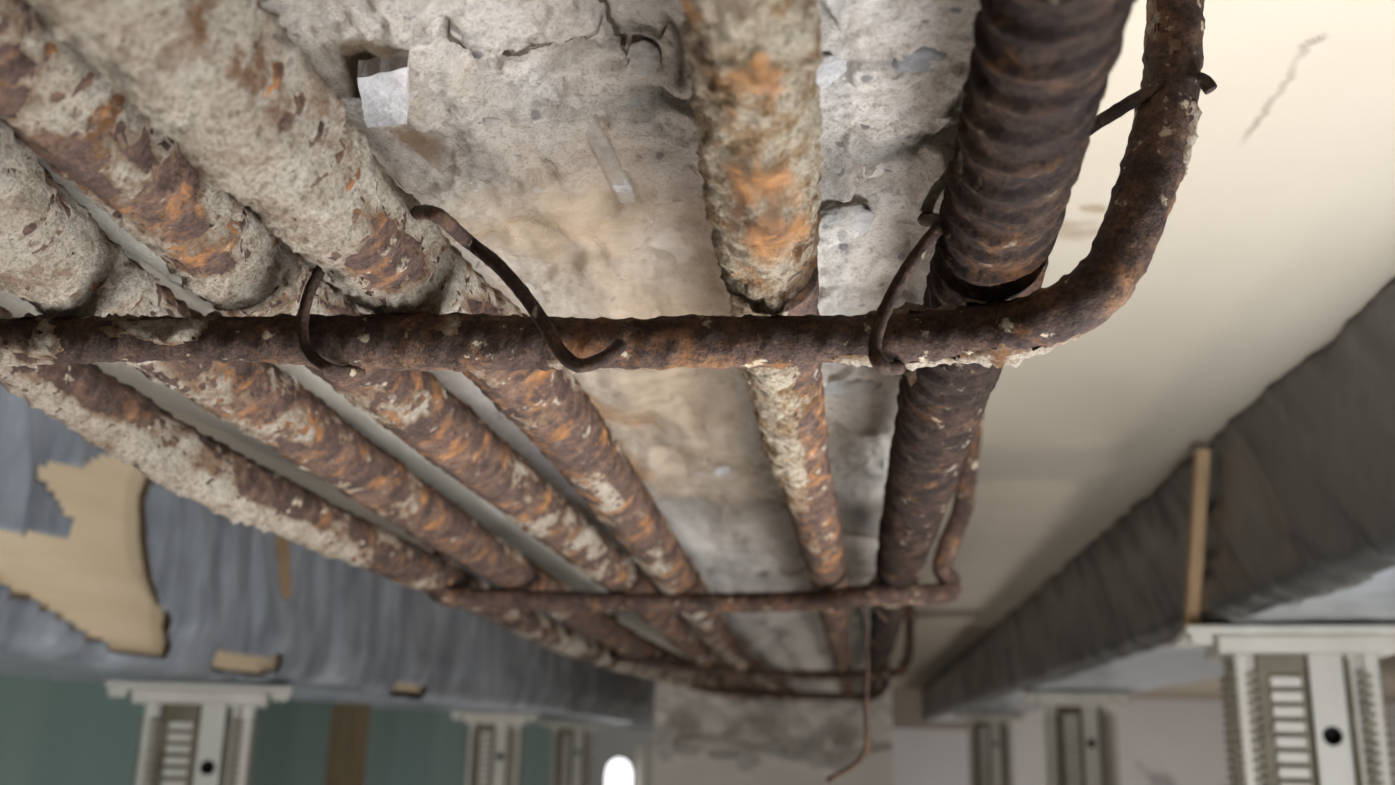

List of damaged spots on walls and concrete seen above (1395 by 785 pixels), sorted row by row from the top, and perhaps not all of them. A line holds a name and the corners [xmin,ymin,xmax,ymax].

rust [725,55,778,98]
rust [397,129,442,164]
spalling [0,0,1138,319]
rust [722,164,808,263]
rust [588,394,654,425]
spalling [0,360,1003,595]
spalling [464,604,908,703]